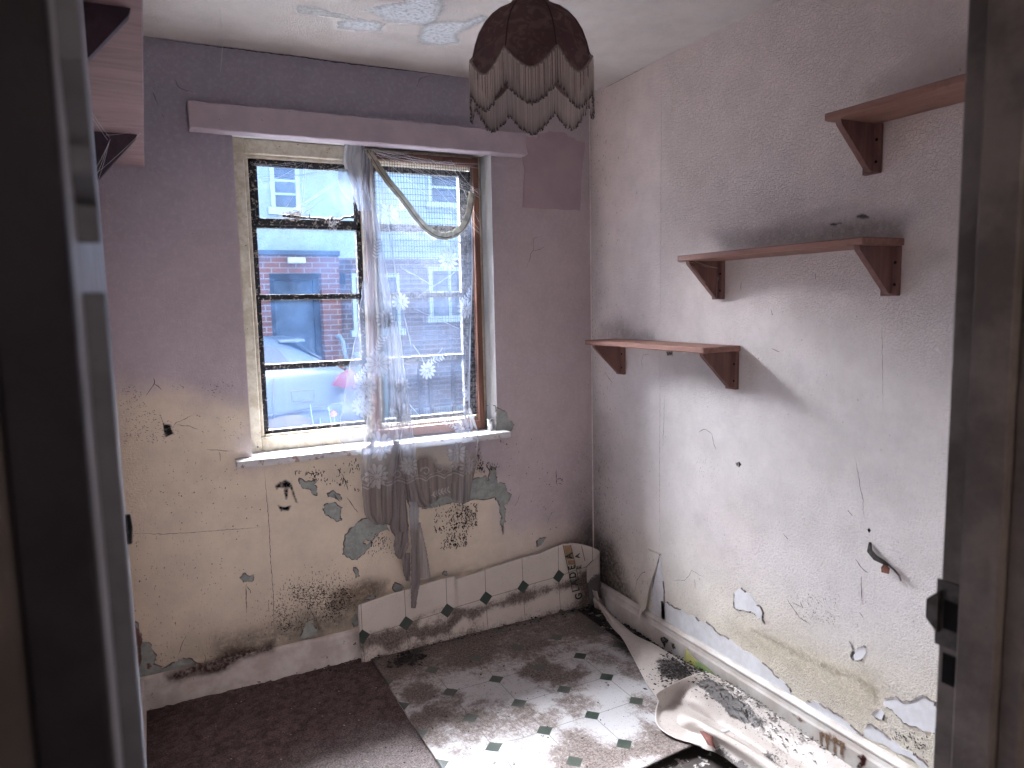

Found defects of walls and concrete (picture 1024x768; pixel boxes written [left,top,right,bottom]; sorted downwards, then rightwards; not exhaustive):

peeling [298,0,484,44]
peeling [486,404,514,431]
peeling [422,466,512,533]
peeling [298,478,390,578]
leakage [434,503,478,549]
peeling [135,621,199,677]
leakage [168,643,273,680]
leakage [274,582,381,632]
peeling [651,554,792,695]
peeling [853,645,867,661]
peeling [806,695,936,768]